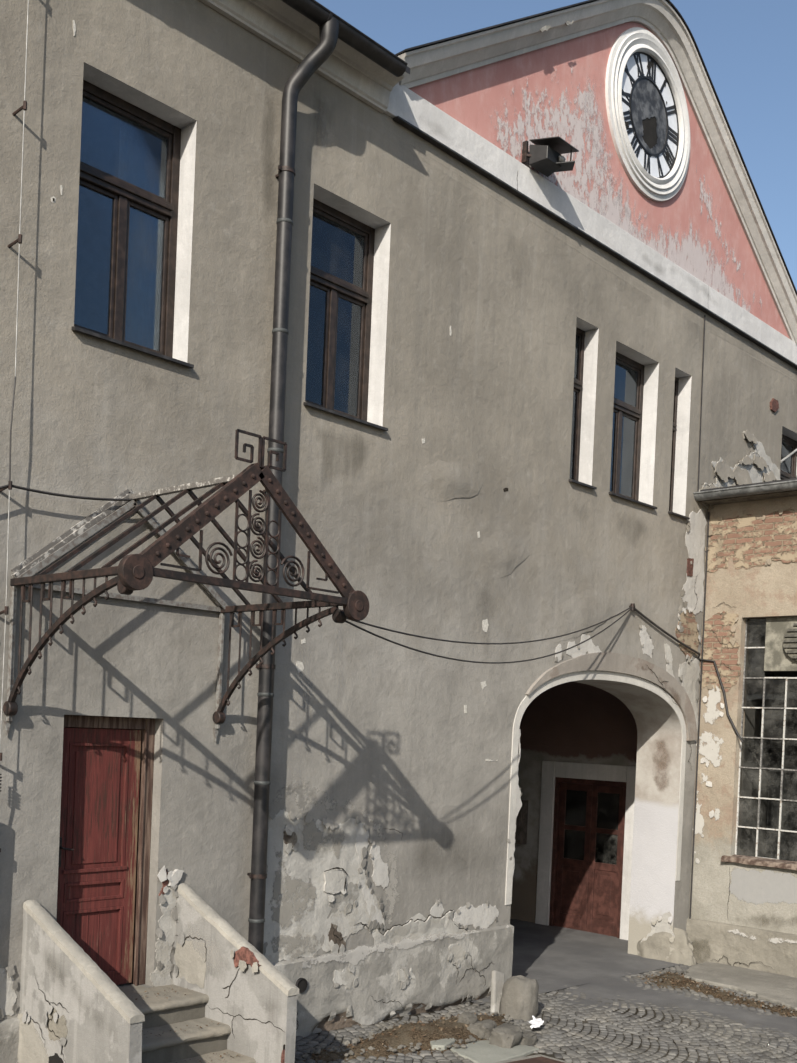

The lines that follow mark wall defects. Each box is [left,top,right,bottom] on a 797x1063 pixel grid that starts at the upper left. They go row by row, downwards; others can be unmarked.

peeling [497,81,762,313]
peeling [555,634,602,662]
flaking render [639,430,797,837]
spalling [150,865,206,988]
peeling [230,782,499,989]
peeling [0,964,68,1063]
crack [32,980,69,1063]
crack [208,969,298,1038]
spalling [312,1004,361,1032]
spalling [380,987,491,1023]